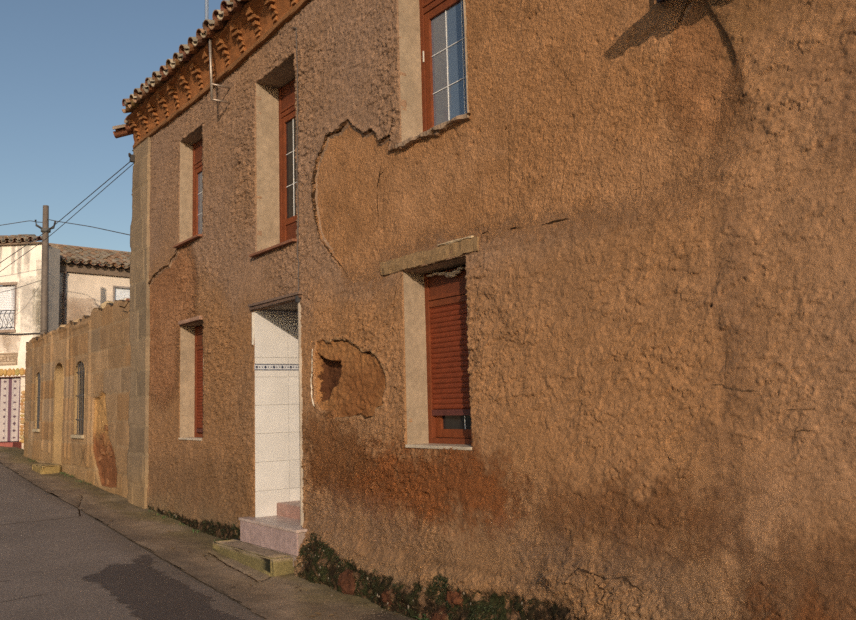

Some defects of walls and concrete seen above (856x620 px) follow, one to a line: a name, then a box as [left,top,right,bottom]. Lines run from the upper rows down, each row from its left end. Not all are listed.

flaking render [311,0,751,291]
flaking render [310,337,387,420]
spalling [93,392,117,488]
leakage [302,412,519,528]
leakage [541,478,739,556]
leakage [744,539,856,620]